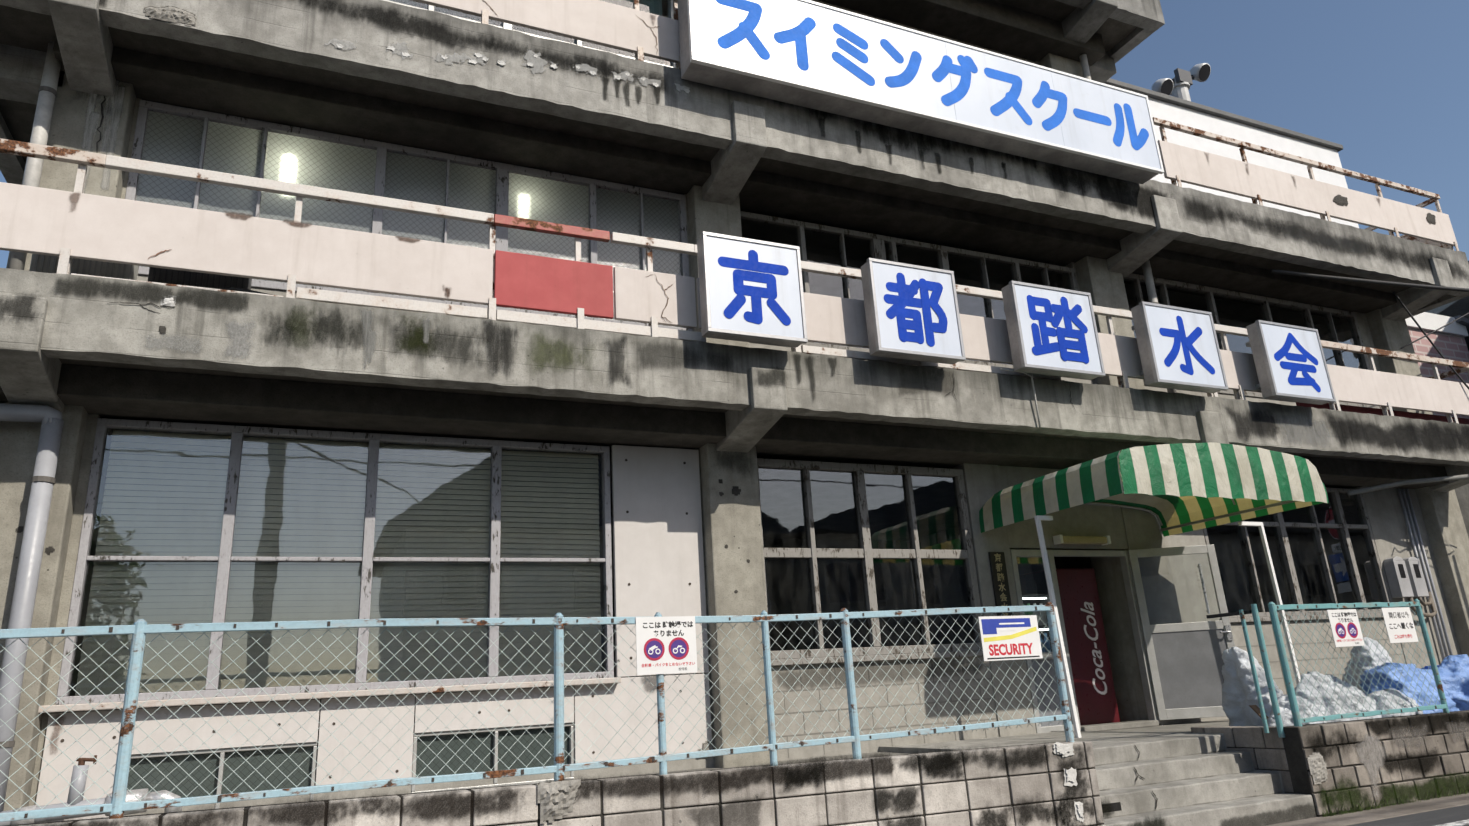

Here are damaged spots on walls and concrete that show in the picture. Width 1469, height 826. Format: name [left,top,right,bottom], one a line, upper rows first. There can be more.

peeling [433,50,690,93]
crack [96,95,106,150]
damp [854,121,1166,218]
damp [1185,198,1466,277]
damp [0,295,36,319]
damp [56,277,295,357]
crack [647,275,673,323]
damp [394,319,517,373]
damp [759,354,836,398]
damp [1228,408,1469,451]
damp [546,745,1113,826]
damp [1134,817,1165,826]